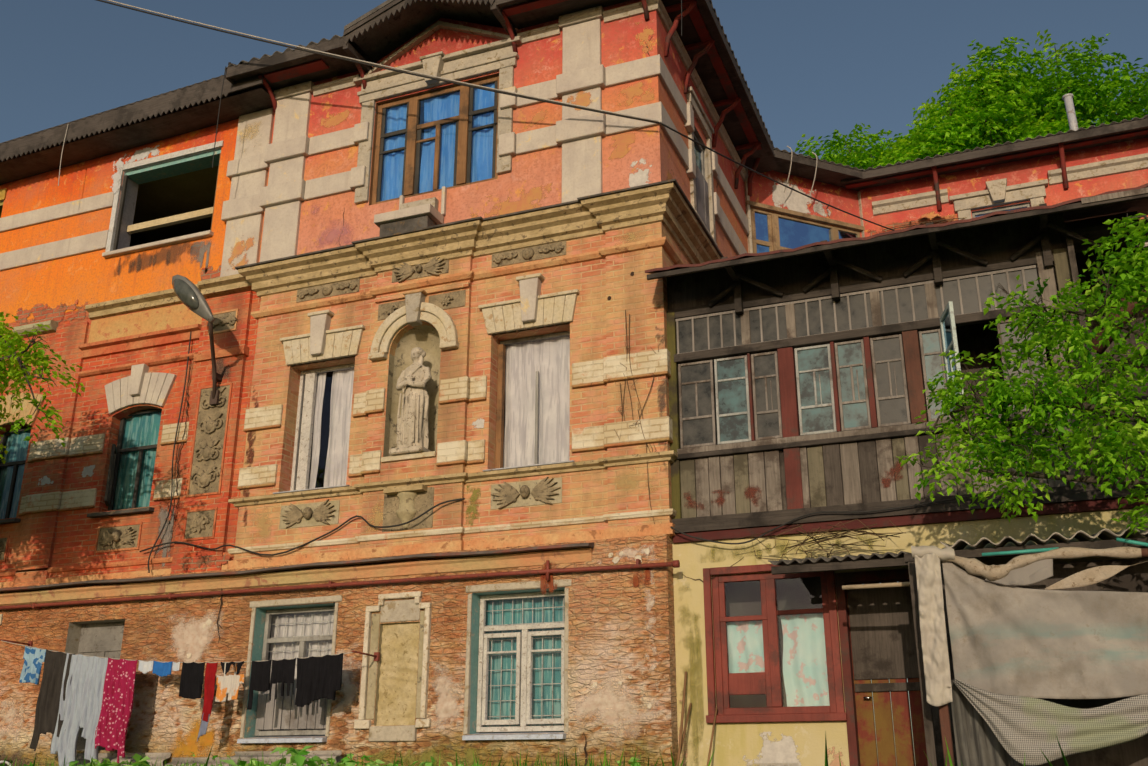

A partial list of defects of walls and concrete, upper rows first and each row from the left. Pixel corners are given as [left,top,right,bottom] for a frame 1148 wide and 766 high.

peeling [629,158,652,187]
peeling [772,179,831,217]
spalling [867,211,959,236]
spalling [15,299,88,326]
leakage [684,638,703,746]
peeling [742,732,801,766]